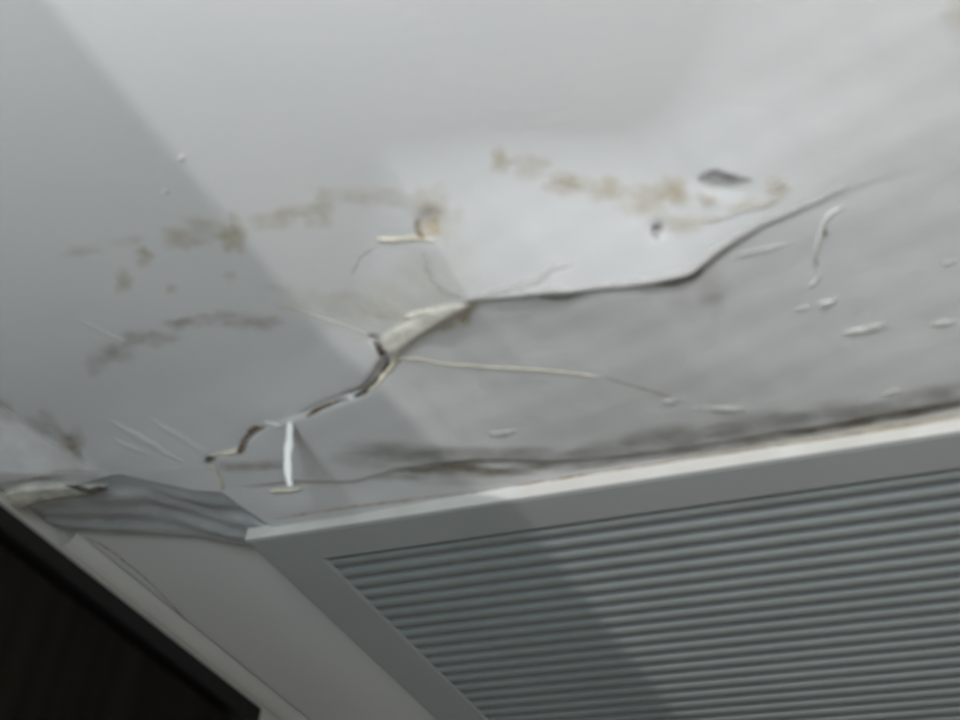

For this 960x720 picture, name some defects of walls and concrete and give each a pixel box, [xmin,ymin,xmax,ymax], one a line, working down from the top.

crack [308,341,594,415]
peeling [0,407,301,545]